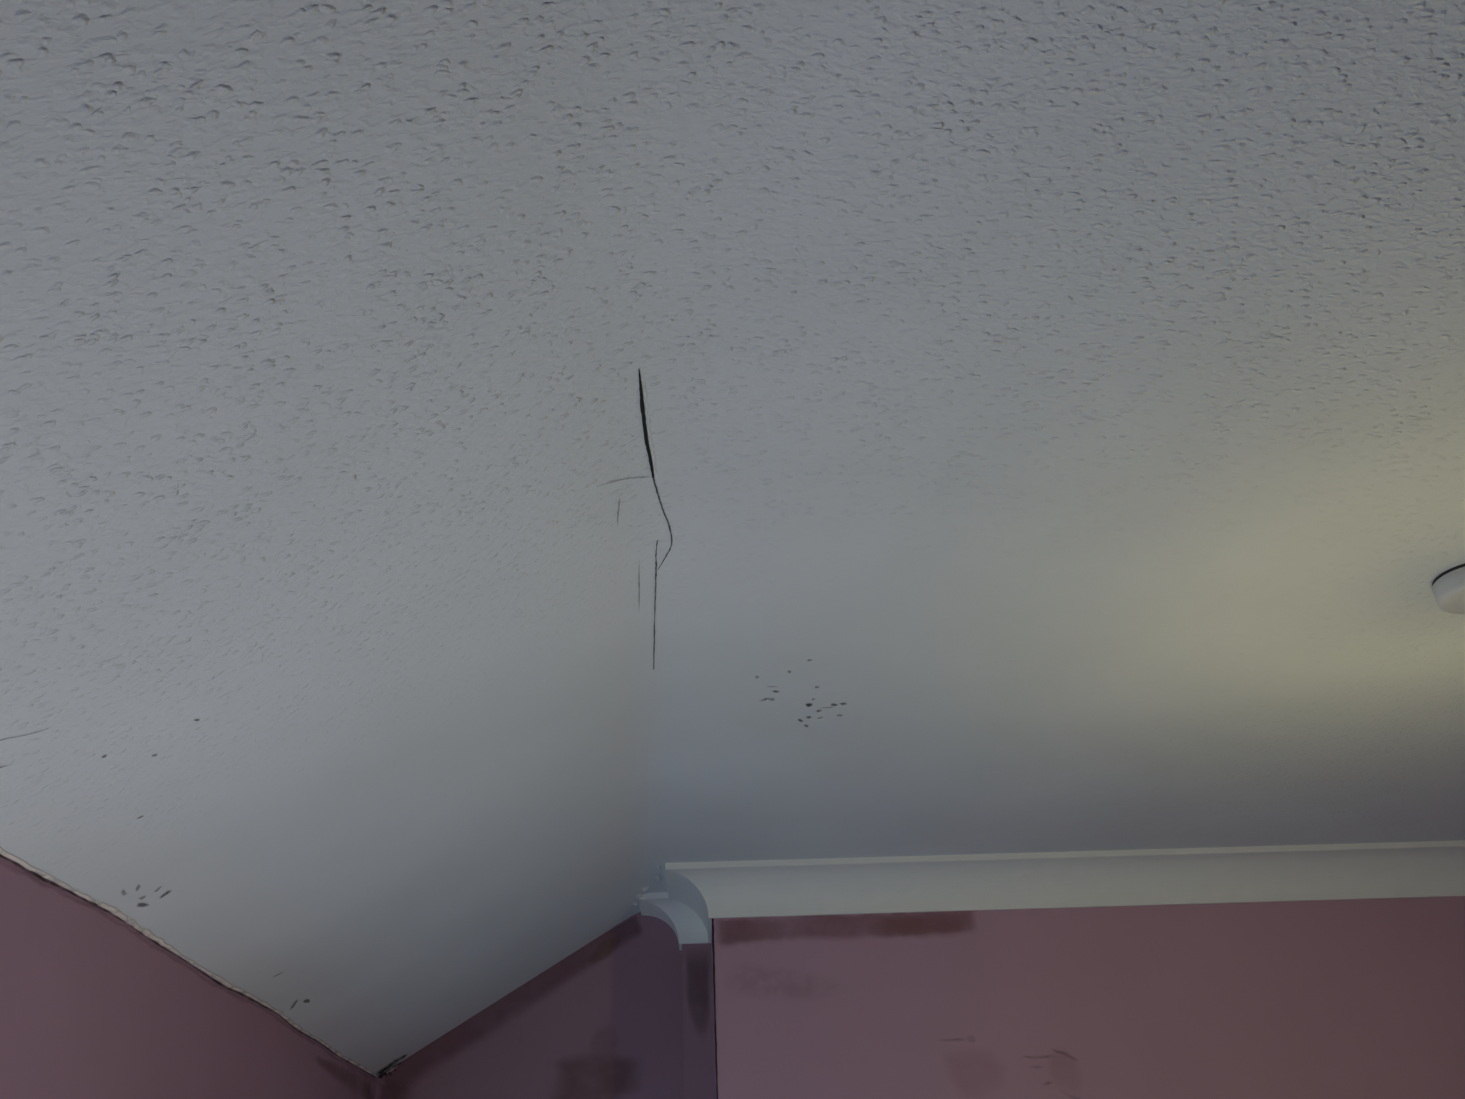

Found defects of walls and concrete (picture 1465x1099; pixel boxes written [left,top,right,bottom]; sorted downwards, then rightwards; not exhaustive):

crack [615,369,673,670]